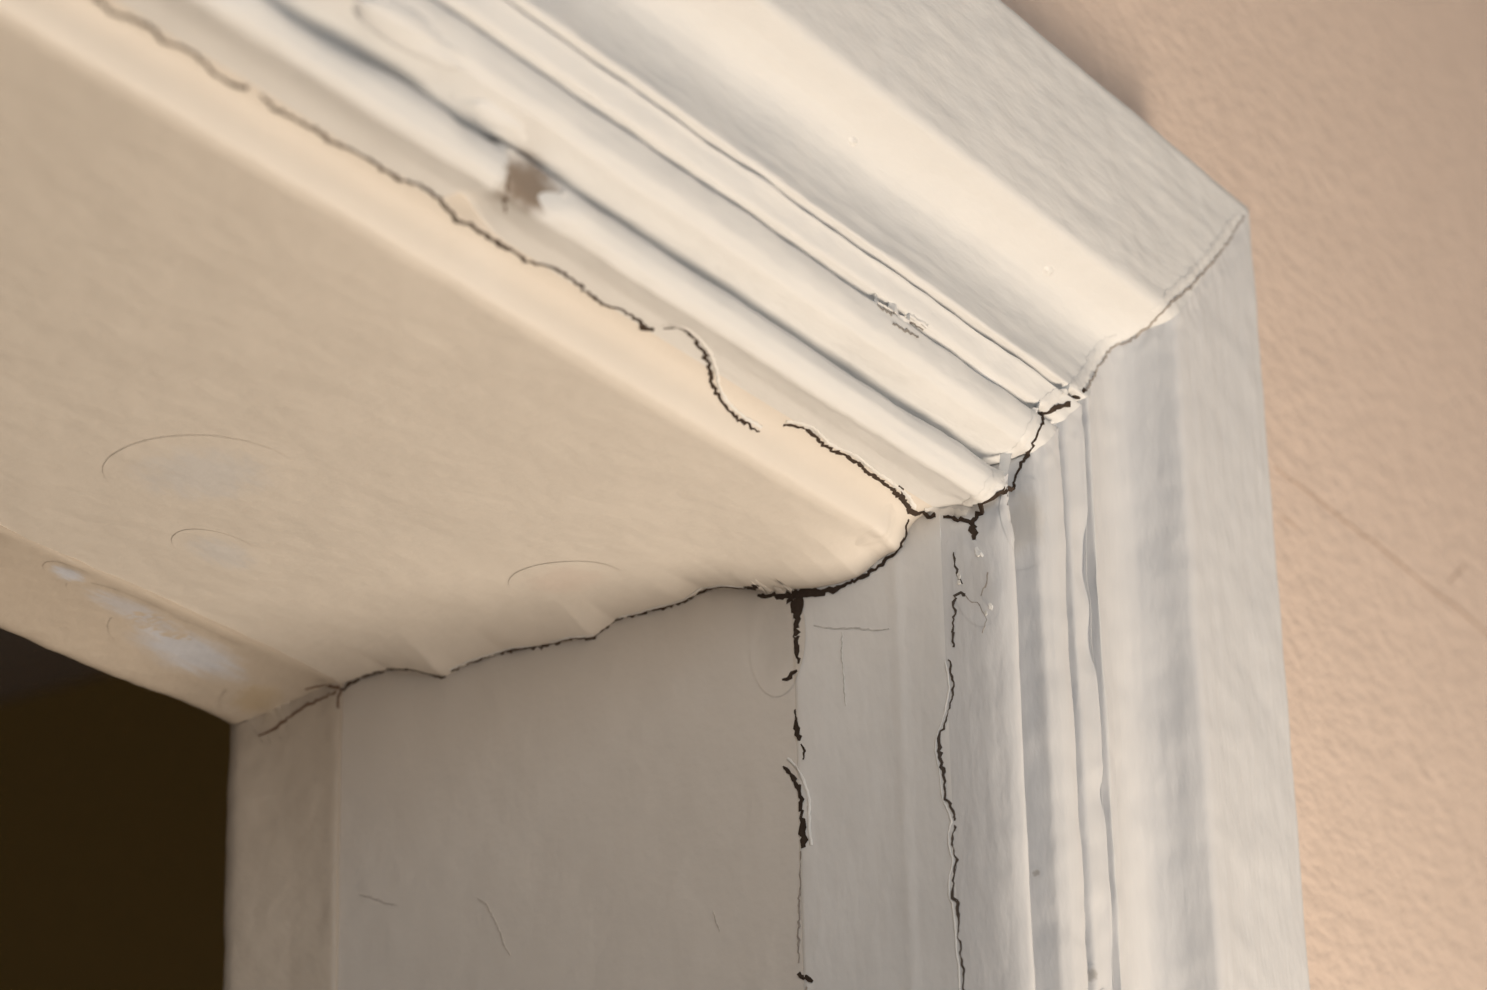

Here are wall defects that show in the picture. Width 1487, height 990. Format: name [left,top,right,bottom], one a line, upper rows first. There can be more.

crack [94,0,1245,990]